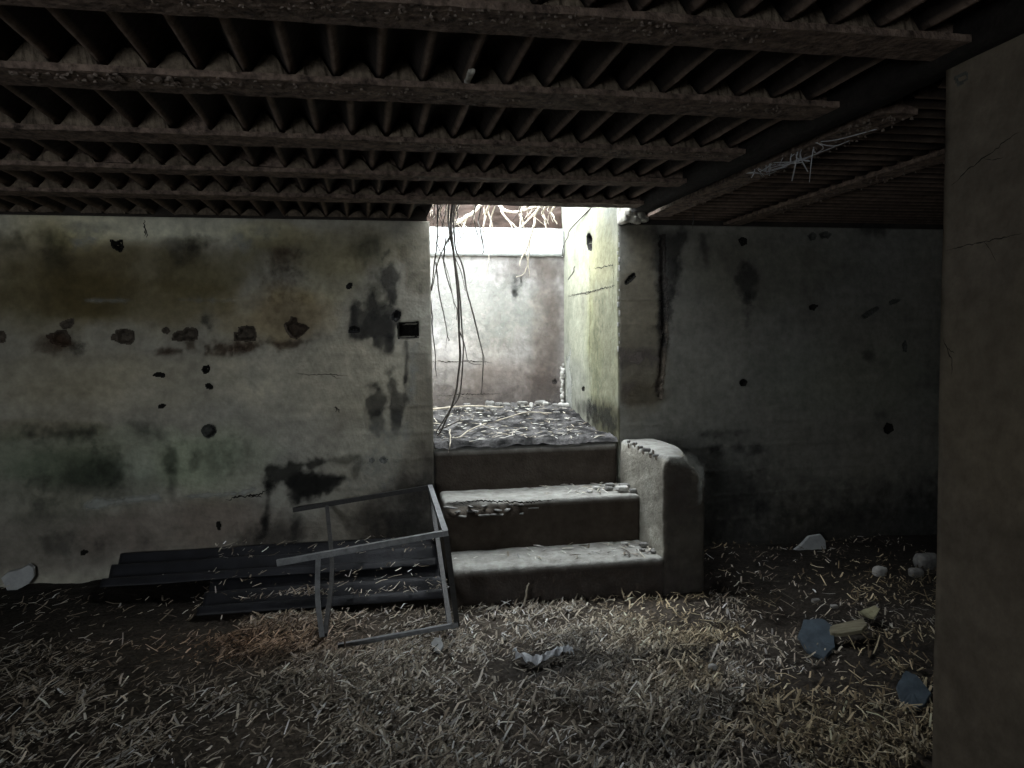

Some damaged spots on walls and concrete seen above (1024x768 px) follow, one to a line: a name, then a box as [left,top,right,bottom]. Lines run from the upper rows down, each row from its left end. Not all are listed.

water stain [655,232,687,320]
spalling [111,329,135,345]
spalling [161,327,198,342]
spalling [234,325,257,342]
spalling [284,316,310,339]
water stain [351,265,408,429]
spalling [627,440,659,460]
water stain [187,458,345,503]
spalling [443,504,539,518]